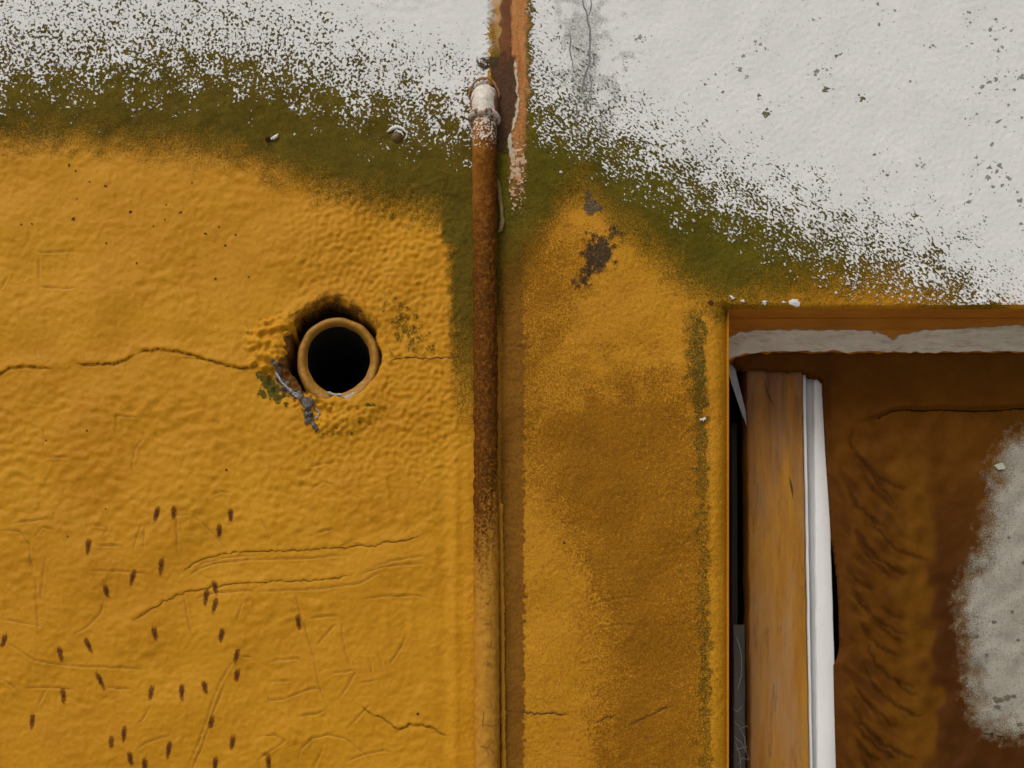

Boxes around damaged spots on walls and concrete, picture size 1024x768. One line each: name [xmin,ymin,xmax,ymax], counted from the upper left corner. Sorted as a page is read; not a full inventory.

corrosion [493,0,533,193]
crack [77,348,259,372]
crack [878,408,1024,419]
water stain [521,220,710,768]
crack [134,536,419,619]